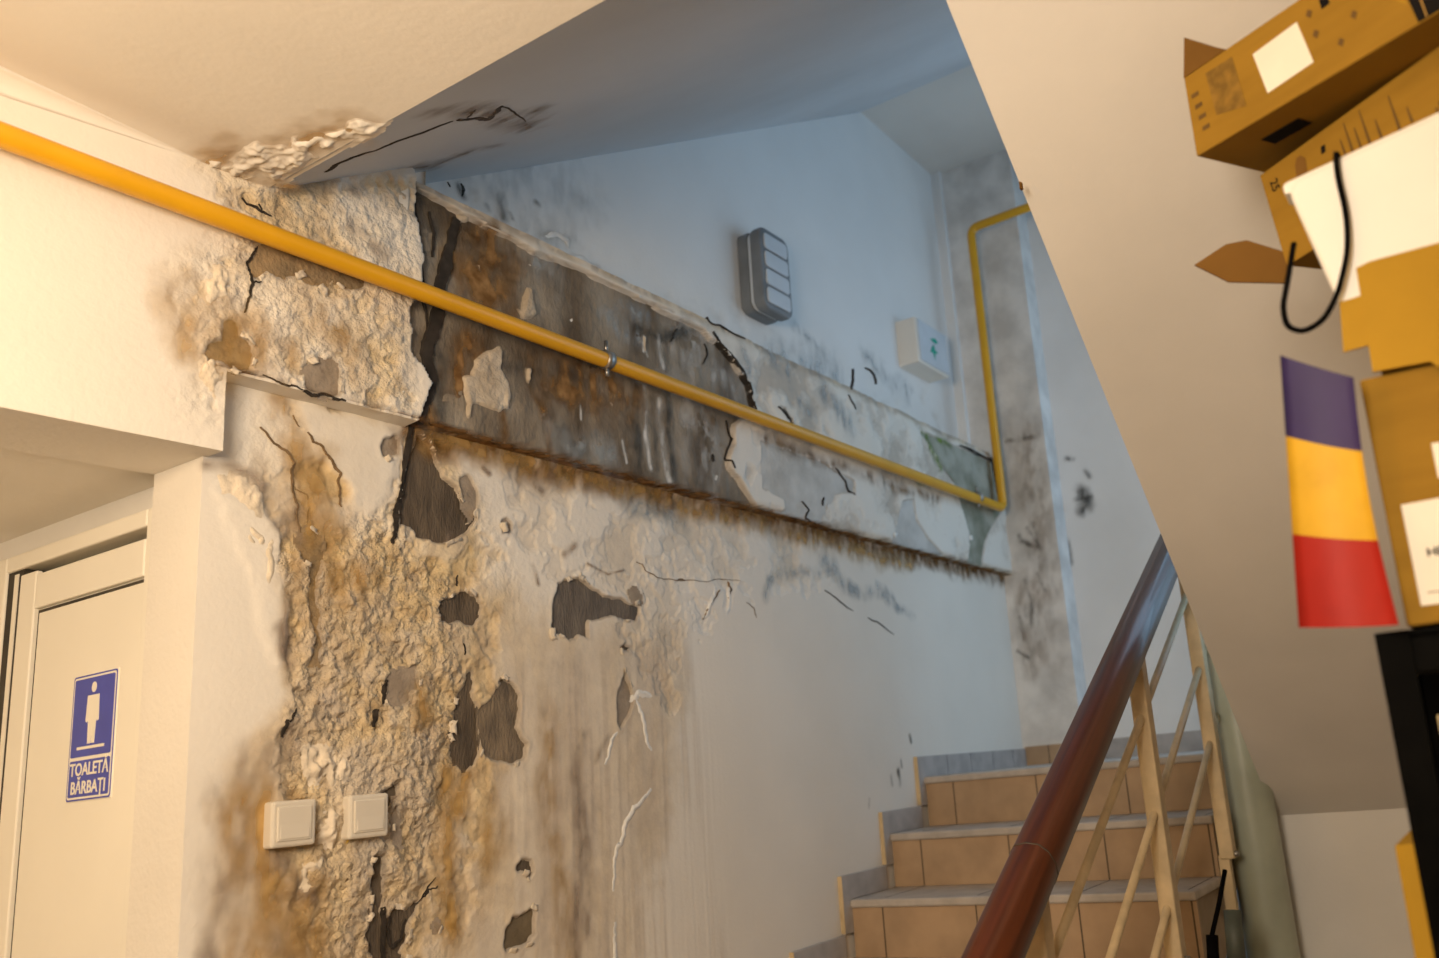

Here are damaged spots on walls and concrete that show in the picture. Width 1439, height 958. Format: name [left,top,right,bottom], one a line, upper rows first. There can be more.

peeling [209,118,393,188]
crack [325,105,526,172]
crack [241,197,272,313]
crack [390,182,465,544]
spalling [405,192,753,507]
crack [259,374,346,533]
spalling [381,437,480,547]
leakage [280,602,289,666]
spalling [438,587,479,626]
spalling [549,572,644,641]
spalling [447,672,524,773]
crack [380,877,438,958]